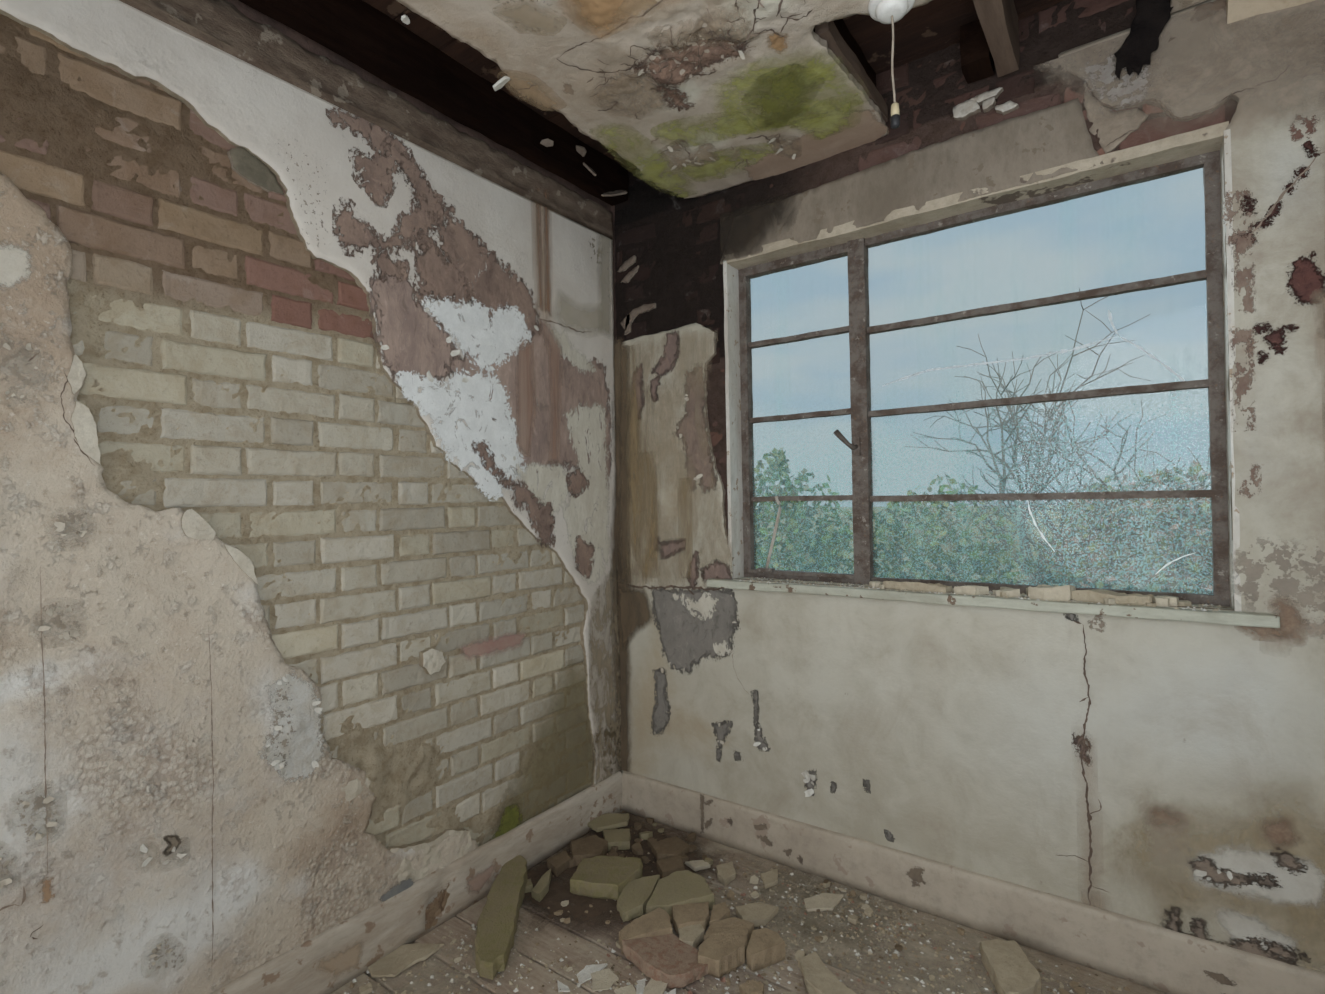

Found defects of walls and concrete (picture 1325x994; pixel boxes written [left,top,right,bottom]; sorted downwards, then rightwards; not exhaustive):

damp [508,76,574,108]
crack [557,0,813,170]
damp [768,32,787,52]
peeling [1289,114,1320,158]
spalling [597,0,1238,536]
peeling [1222,190,1300,432]
peeling [1286,251,1325,306]
spalling [0,14,613,889]
peeling [649,535,741,735]
crack [1058,620,1108,904]
peeling [1160,904,1311,966]
peeling [1187,847,1308,891]